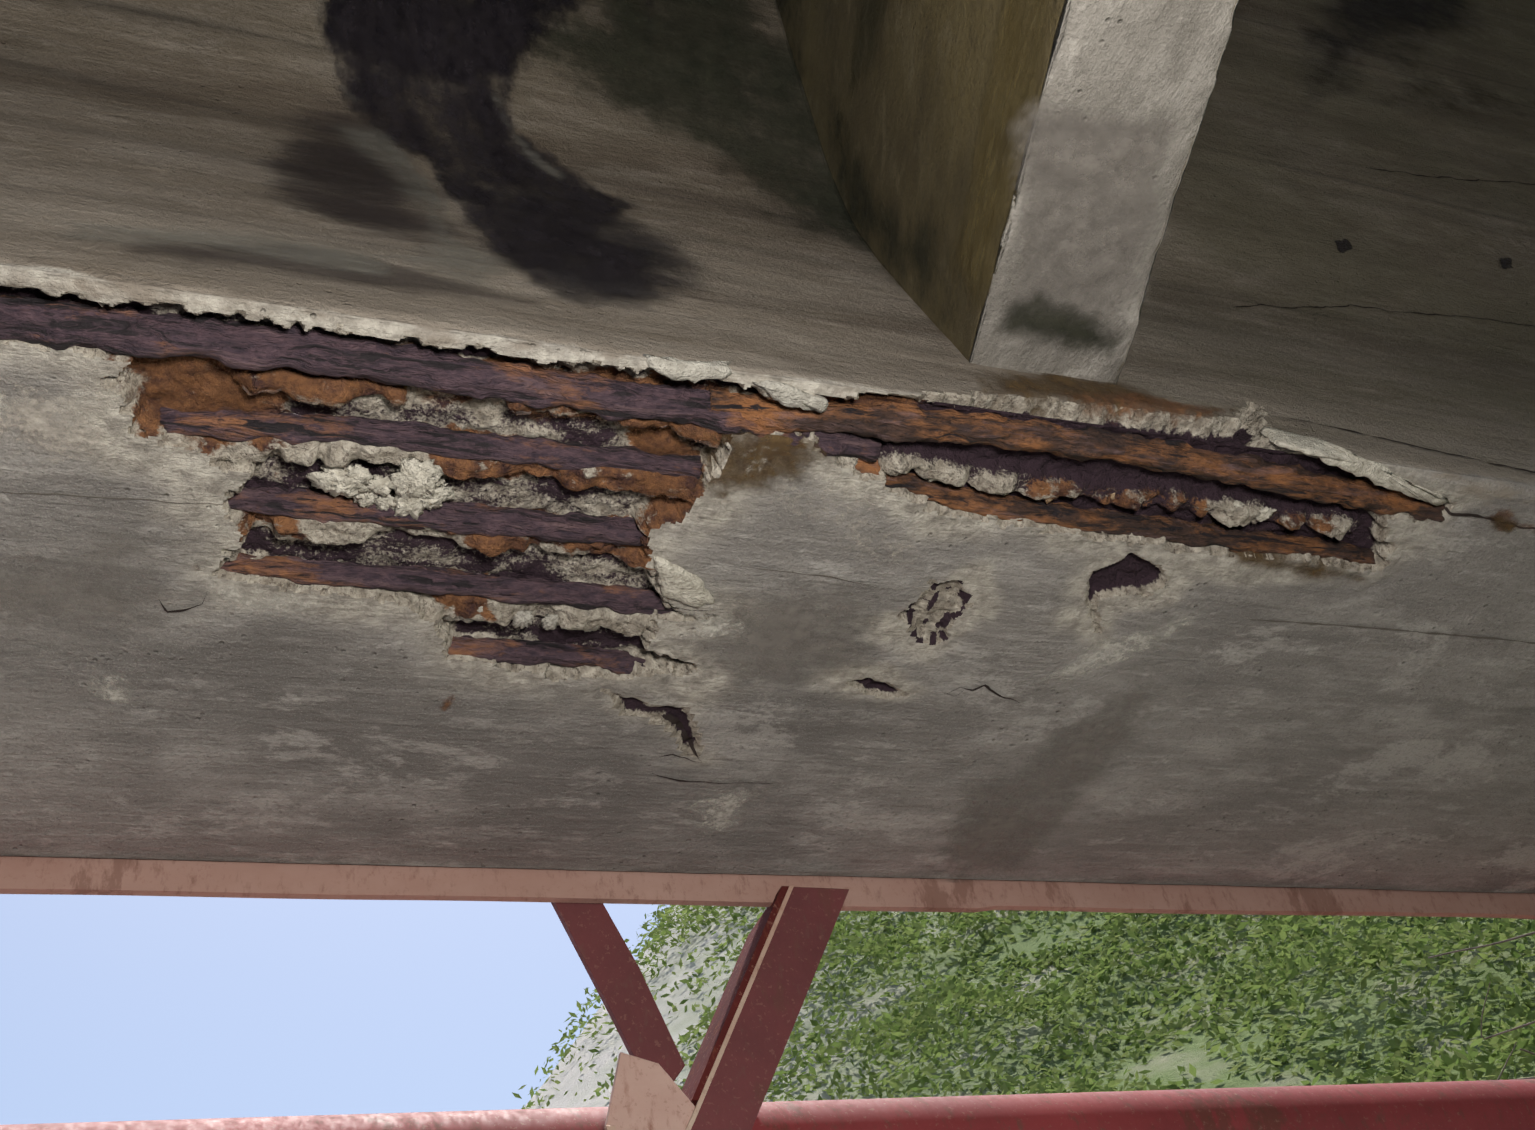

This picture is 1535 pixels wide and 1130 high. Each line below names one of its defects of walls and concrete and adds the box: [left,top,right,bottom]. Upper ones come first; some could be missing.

damp [279,0,930,298]
damp [144,231,457,287]
rust [0,295,1445,579]
spalling [0,285,1457,633]
crack [1284,417,1535,473]
crack [1442,504,1535,529]
spalling [0,346,733,757]
rust [220,552,678,615]
spalling [896,579,975,646]
rust [448,635,646,674]
spalling [845,678,910,699]